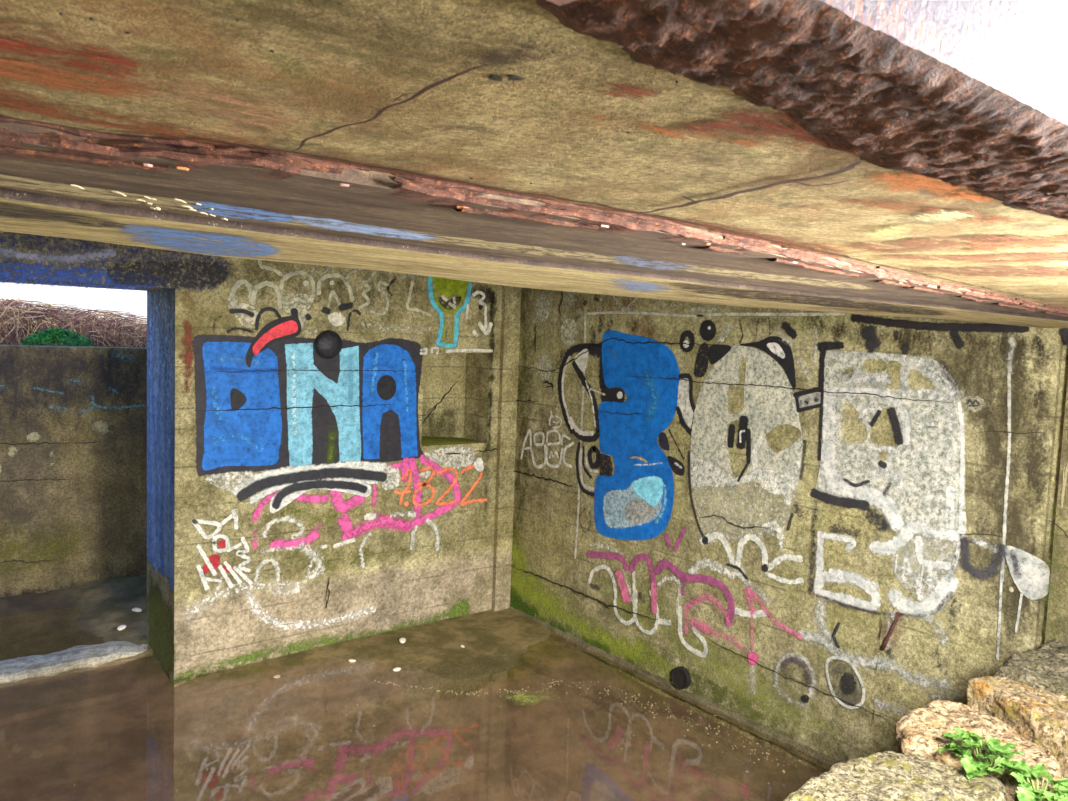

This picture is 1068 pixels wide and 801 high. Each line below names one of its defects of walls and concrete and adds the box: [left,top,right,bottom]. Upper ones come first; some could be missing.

crack [0,64,1042,301]
corrosion [0,21,1068,317]
crack [0,557,52,565]